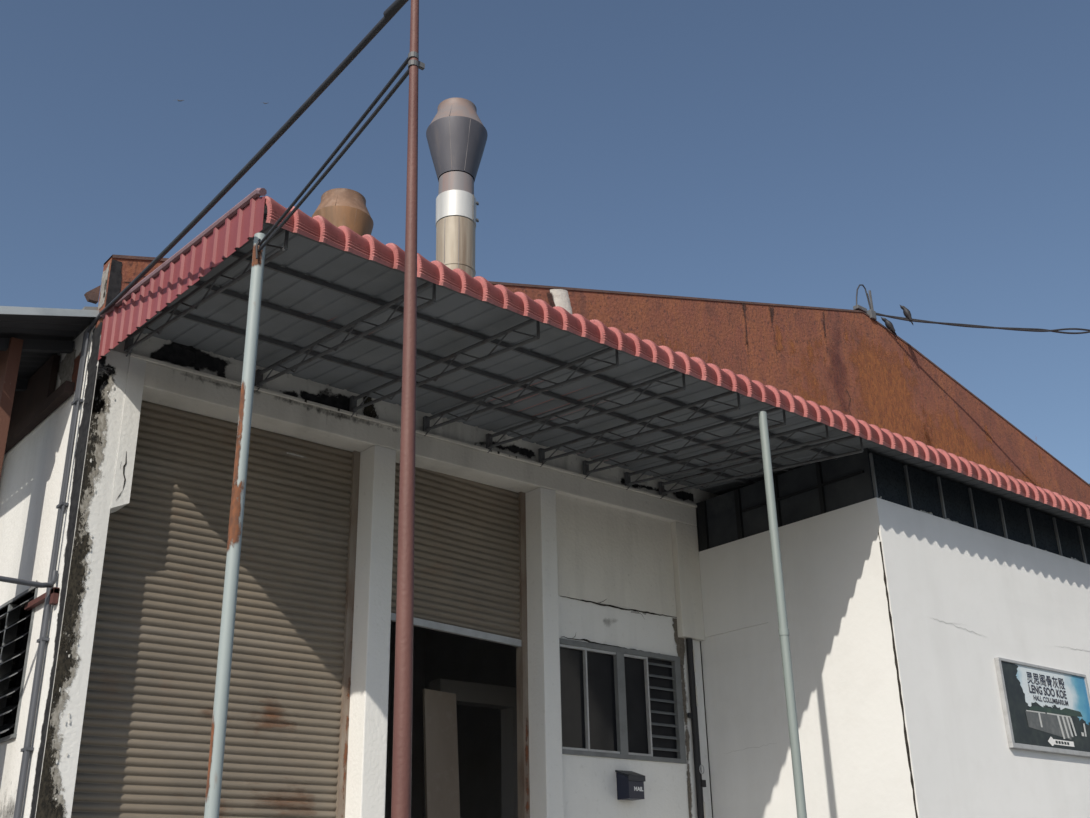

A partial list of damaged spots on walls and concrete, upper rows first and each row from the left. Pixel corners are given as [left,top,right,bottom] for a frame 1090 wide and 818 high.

corrosion [252,245,262,266]
crack [116,451,127,500]
corrosion [227,382,245,550]
peeling [36,364,115,818]